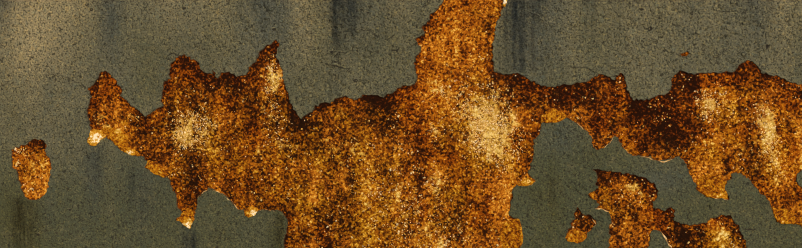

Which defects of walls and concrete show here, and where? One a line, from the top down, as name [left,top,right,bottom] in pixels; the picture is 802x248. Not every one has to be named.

rust [12,139,52,223]
rust [565,169,746,248]